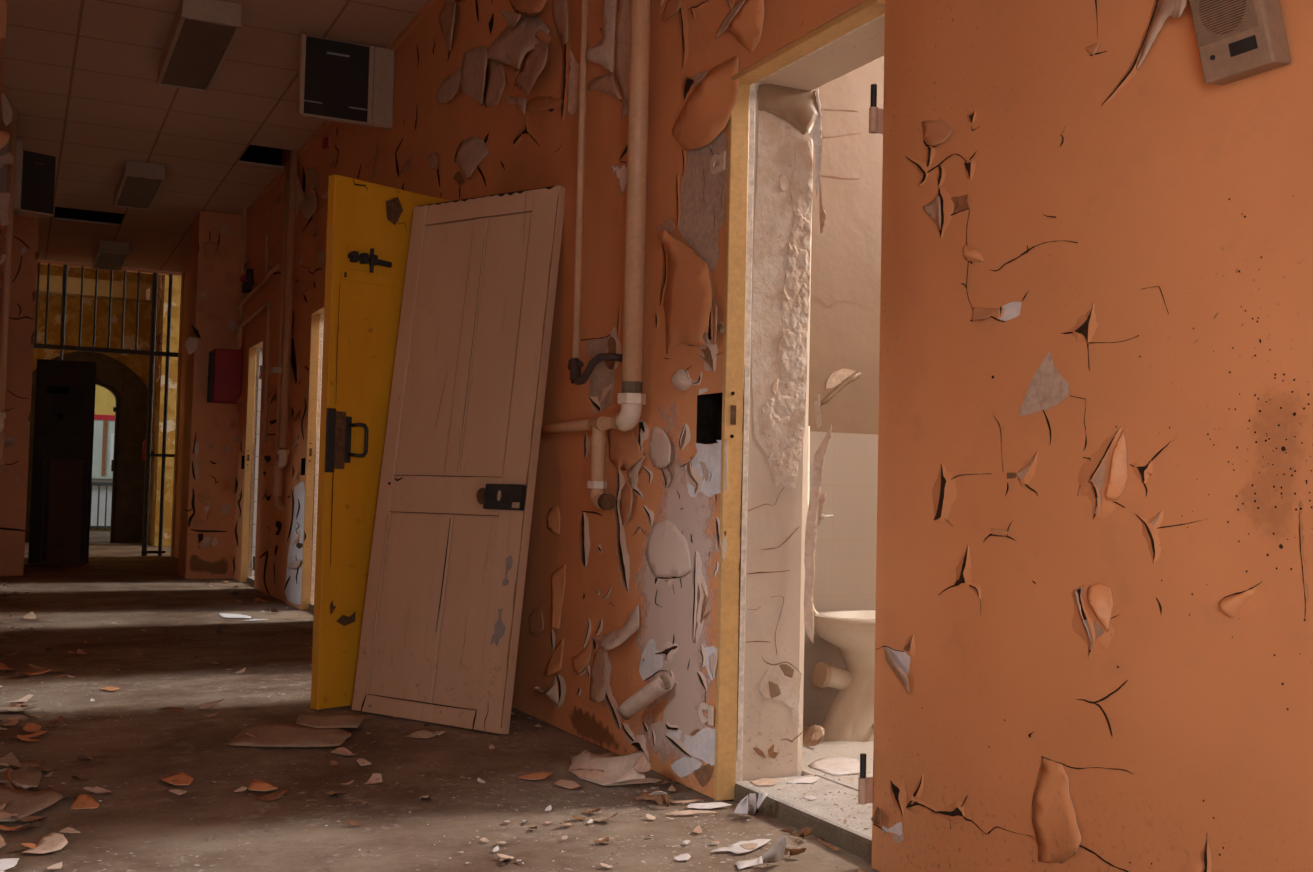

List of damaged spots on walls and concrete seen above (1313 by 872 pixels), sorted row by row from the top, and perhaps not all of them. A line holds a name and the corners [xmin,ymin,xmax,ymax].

peeling [436,0,631,120]
peeling [656,0,765,373]
crack [905,110,1078,311]
spalling [752,84,861,643]
crack [1061,302,1139,370]
flaking render [259,463,306,605]
flaking render [529,409,728,787]
crack [939,410,1051,615]
peeling [1077,426,1201,563]
crack [1129,438,1176,495]
crack [1076,680,1128,737]
crack [906,773,1036,841]